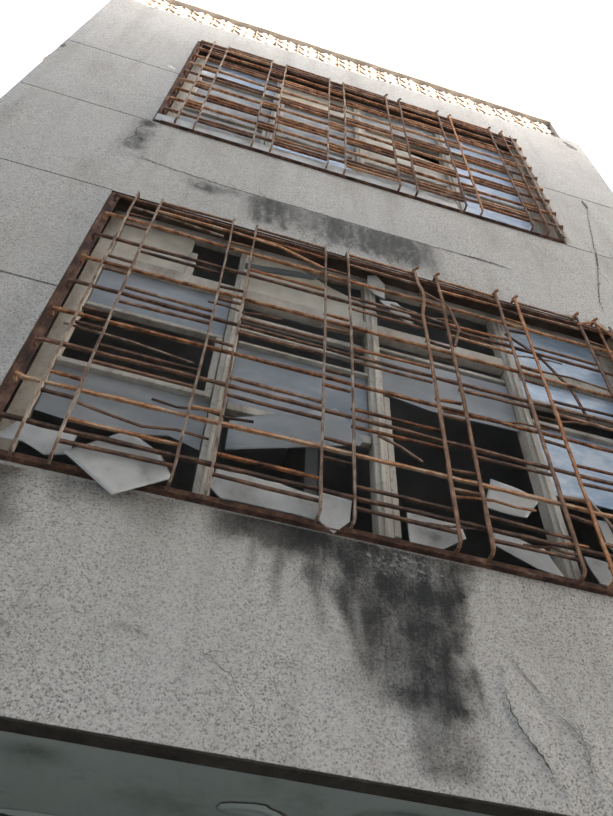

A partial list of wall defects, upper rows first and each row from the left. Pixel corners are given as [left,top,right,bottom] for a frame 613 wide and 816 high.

leakage [253,198,302,229]
crack [122,125,509,269]
leakage [312,215,434,267]
crack [586,204,608,314]
crack [201,650,239,693]
leakage [214,511,483,776]